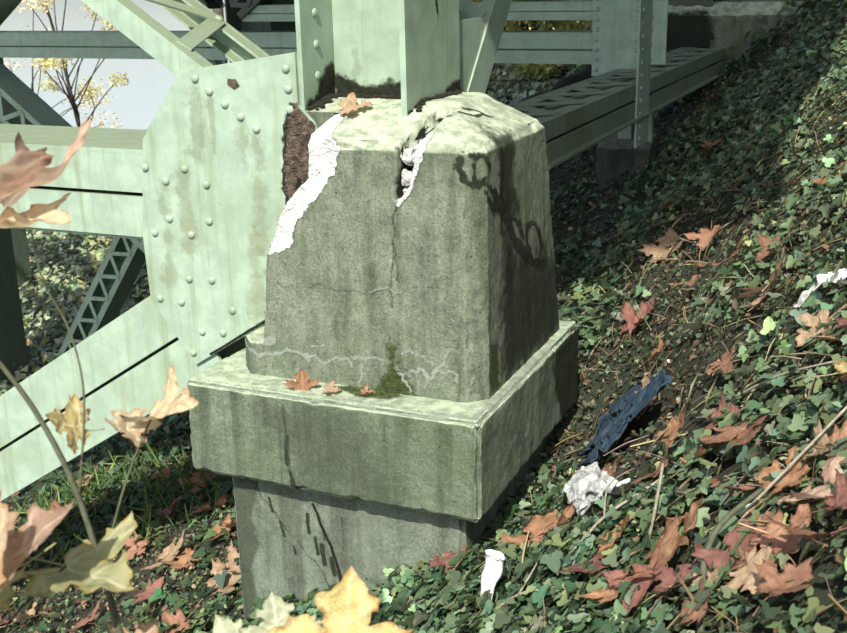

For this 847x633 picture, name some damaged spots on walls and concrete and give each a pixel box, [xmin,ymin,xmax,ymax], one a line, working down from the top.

corrosion [281,102,316,205]
spalling [269,113,343,254]